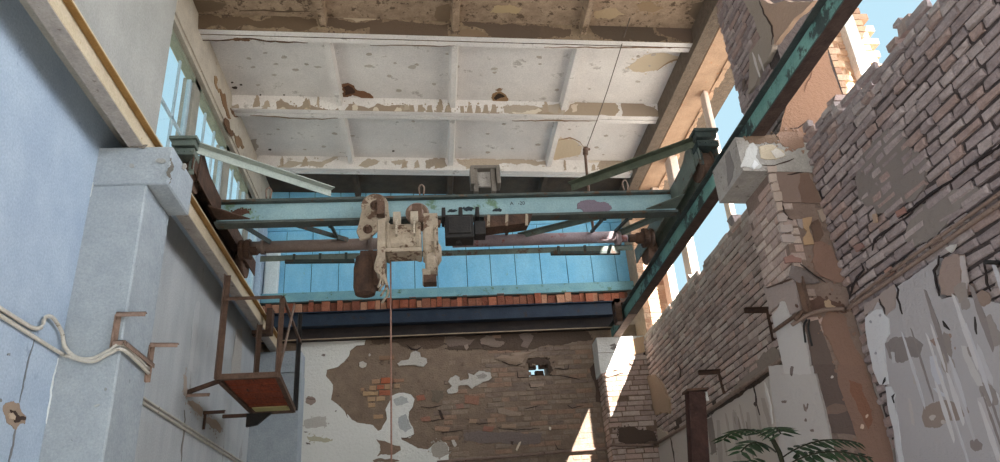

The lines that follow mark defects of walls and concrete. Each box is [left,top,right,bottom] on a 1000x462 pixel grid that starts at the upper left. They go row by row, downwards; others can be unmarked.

crack [752,1,774,77]
spalling [342,83,373,98]
spalling [491,88,508,101]
peeling [740,49,843,245]
crack [849,144,1000,299]
crack [8,430,16,462]
spalling [3,401,26,430]
crack [19,340,35,402]
peeling [301,340,457,462]
peeling [447,371,492,394]
peeling [707,282,856,462]
peeling [854,244,1000,462]